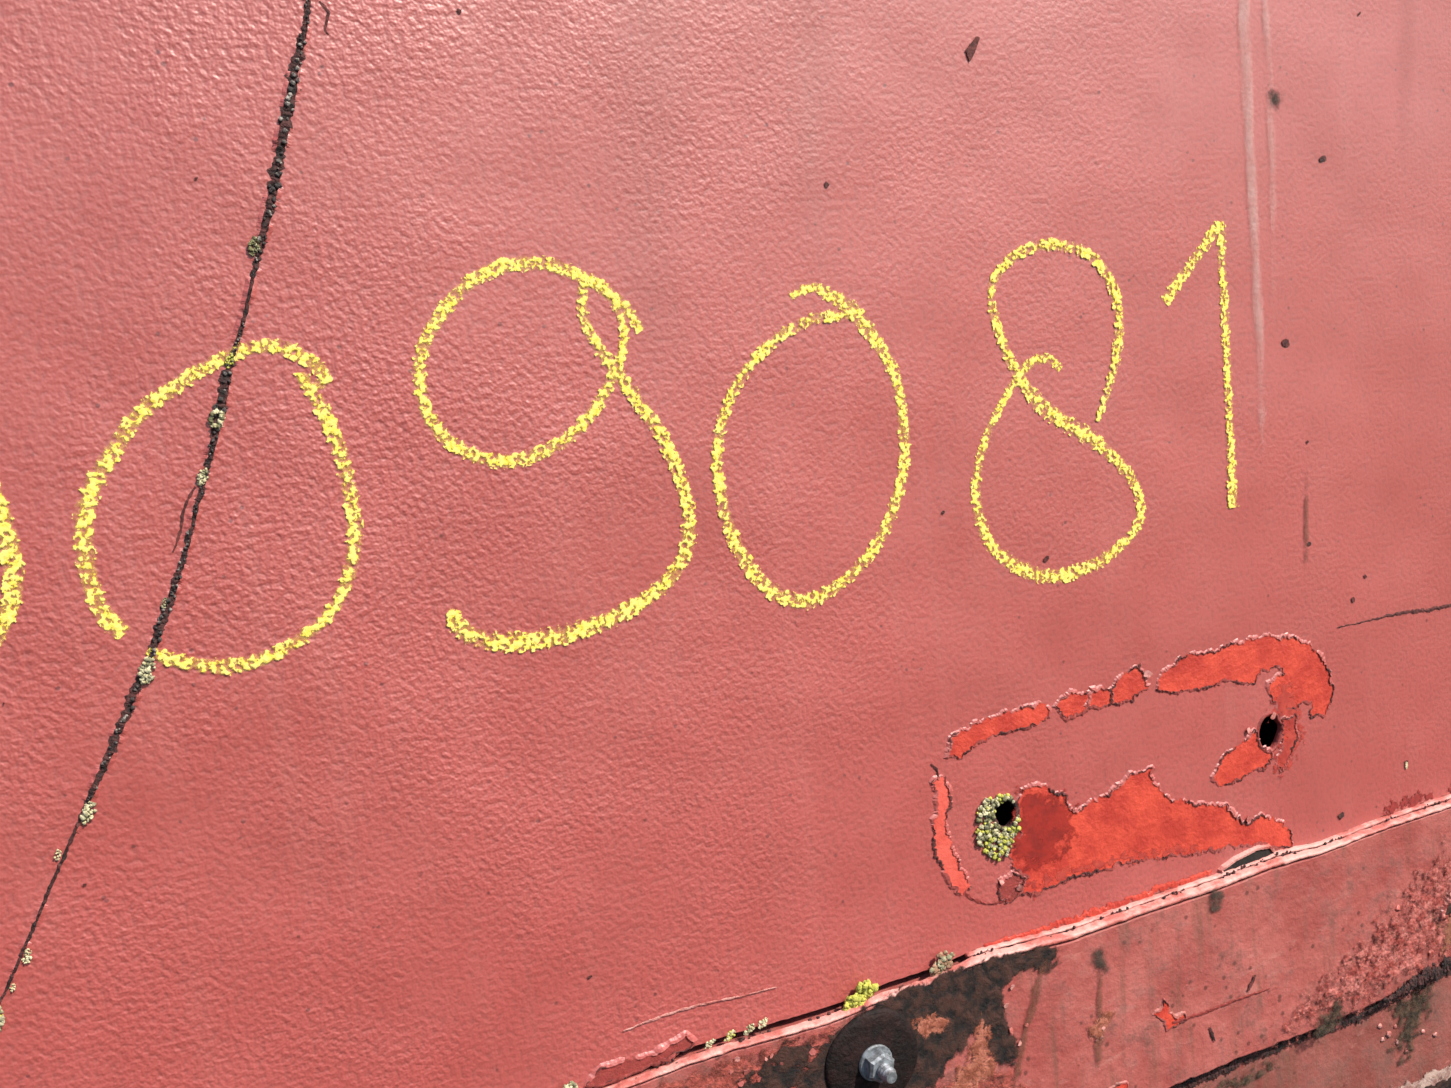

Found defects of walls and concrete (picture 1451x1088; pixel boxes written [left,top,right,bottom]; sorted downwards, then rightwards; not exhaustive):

crack [0,0,330,1005]
crack [1337,604,1451,628]
peeling [929,632,1335,947]
corrosion [639,946,1062,1088]
corrosion [1088,950,1116,1061]
corrosion [1425,1077,1451,1088]